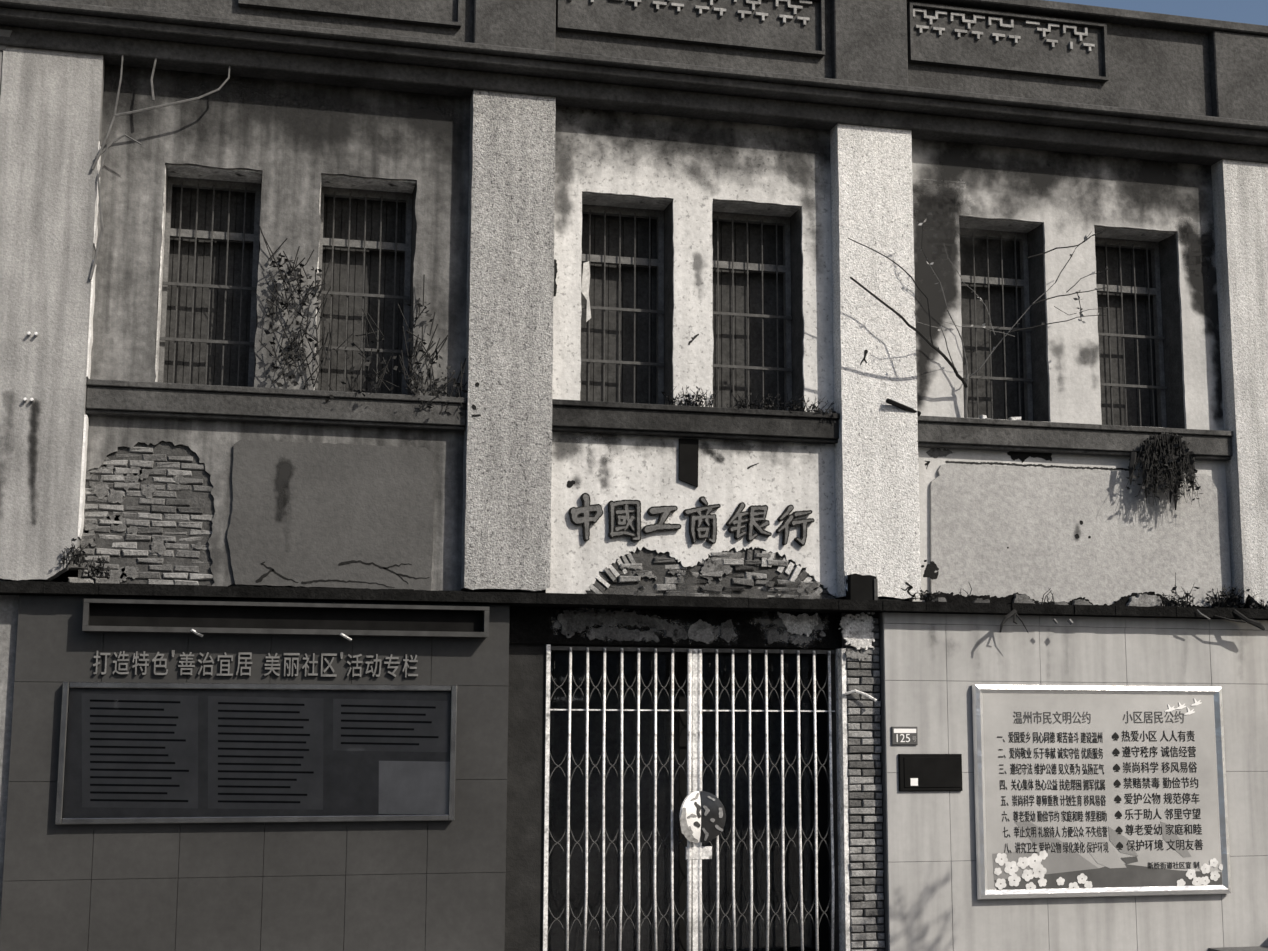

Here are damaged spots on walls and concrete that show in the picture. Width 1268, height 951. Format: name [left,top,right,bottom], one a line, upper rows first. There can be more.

damp [554,106,831,249]
damp [913,139,1223,421]
flaking render [68,447,214,585]
peeling [557,609,734,644]
flaking render [589,550,902,661]